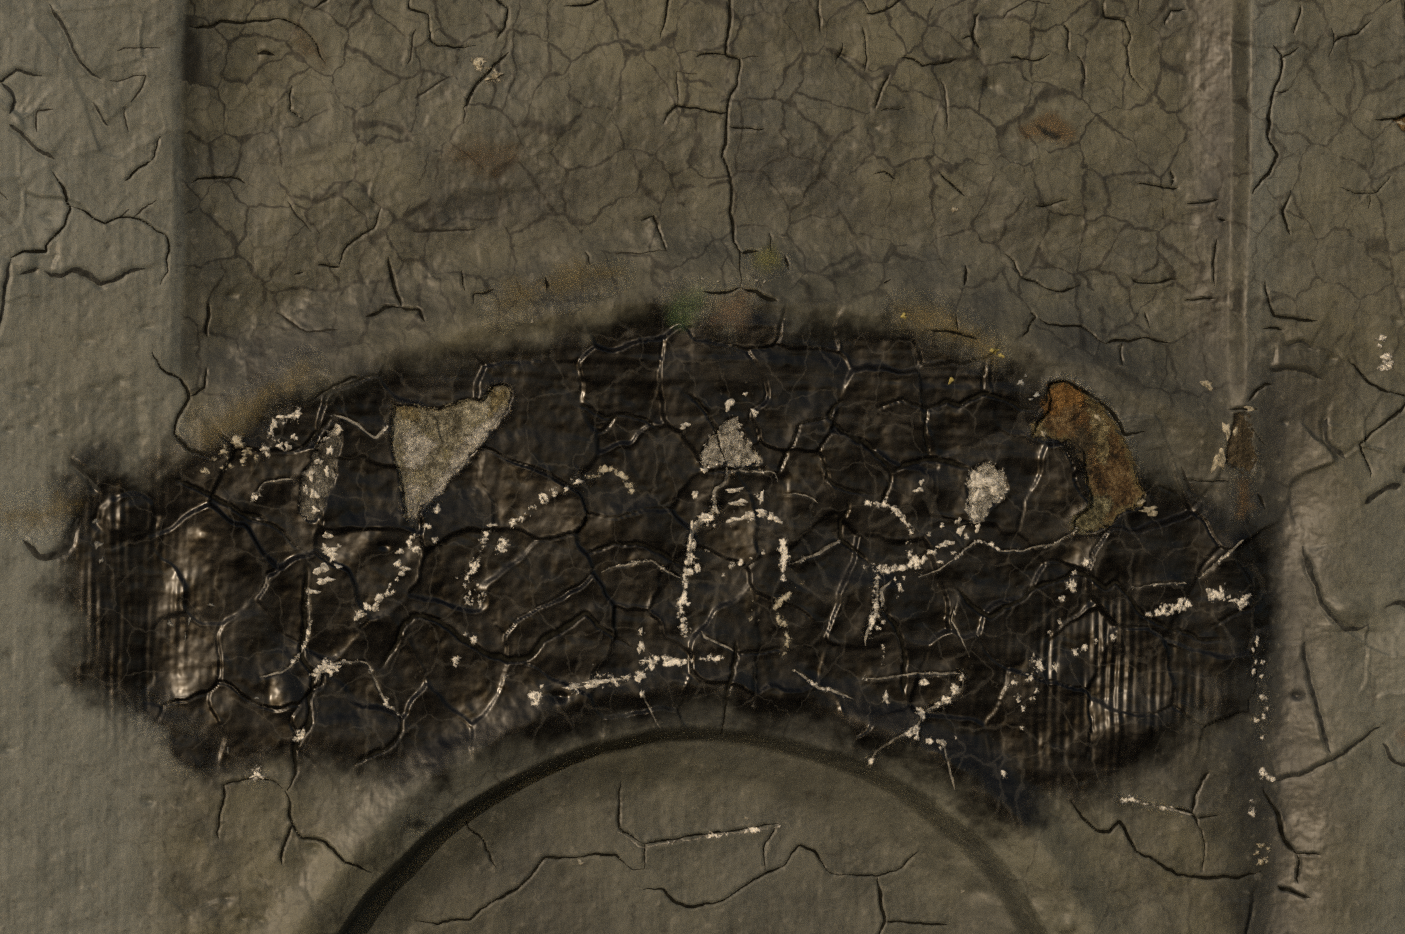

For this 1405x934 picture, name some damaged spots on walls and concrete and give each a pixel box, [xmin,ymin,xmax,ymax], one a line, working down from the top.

crack [11,47,170,284]
crack [663,0,777,302]
crack [152,303,632,873]
spalling [354,385,512,621]
leakage [54,303,1274,828]
spalling [696,392,763,474]
peeling [676,487,805,658]
crack [579,265,1271,790]
spalling [863,461,1009,665]
rust [1031,381,1158,534]
crack [415,782,947,934]
crack [1071,772,1319,898]